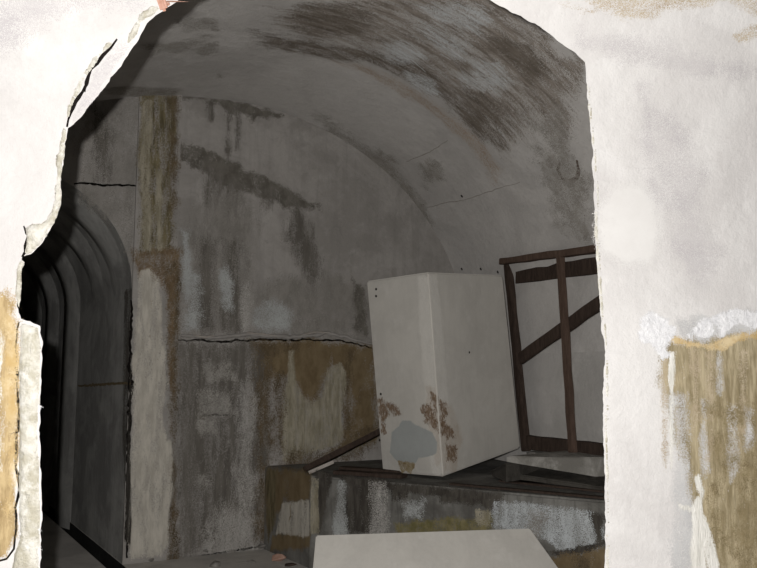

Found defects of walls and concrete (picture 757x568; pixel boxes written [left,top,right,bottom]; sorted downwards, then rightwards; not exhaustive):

spalling [12,323,44,568]
spalling [15,128,67,306]
spalling [67,42,112,117]
spalling [128,0,186,43]
rust [131,95,184,560]
spalling [193,358,239,439]
flaking render [178,331,373,348]
damp [67,86,606,568]
damp [246,0,757,246]
spalling [587,86,597,172]
spalling [594,181,607,349]
damp [637,307,757,568]